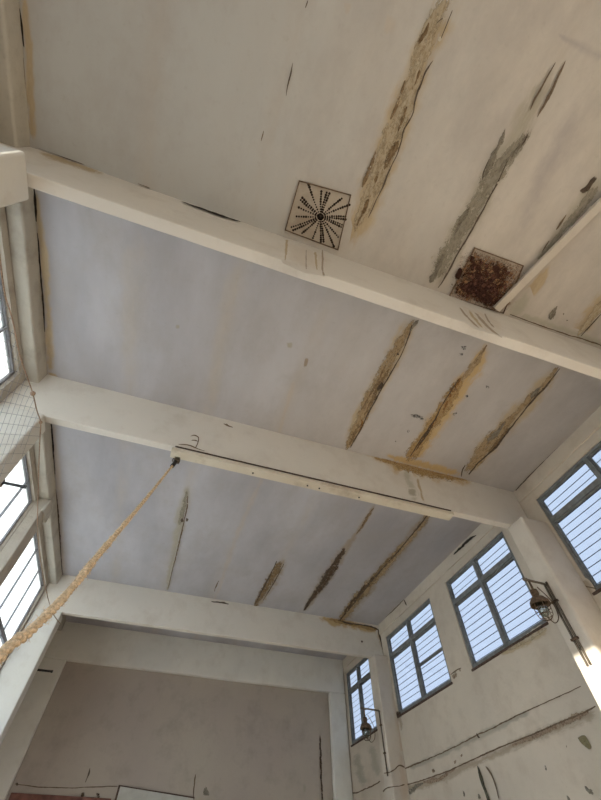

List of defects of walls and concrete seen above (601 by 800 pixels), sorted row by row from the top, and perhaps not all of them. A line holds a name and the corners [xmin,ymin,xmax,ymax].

crack [184,202,240,222]
spalling [346,0,472,254]
spalling [421,56,566,293]
spalling [528,166,601,266]
rust [452,252,521,338]
spalling [341,313,565,503]
spalling [251,555,291,607]
spalling [301,503,379,613]
spalling [317,514,435,643]